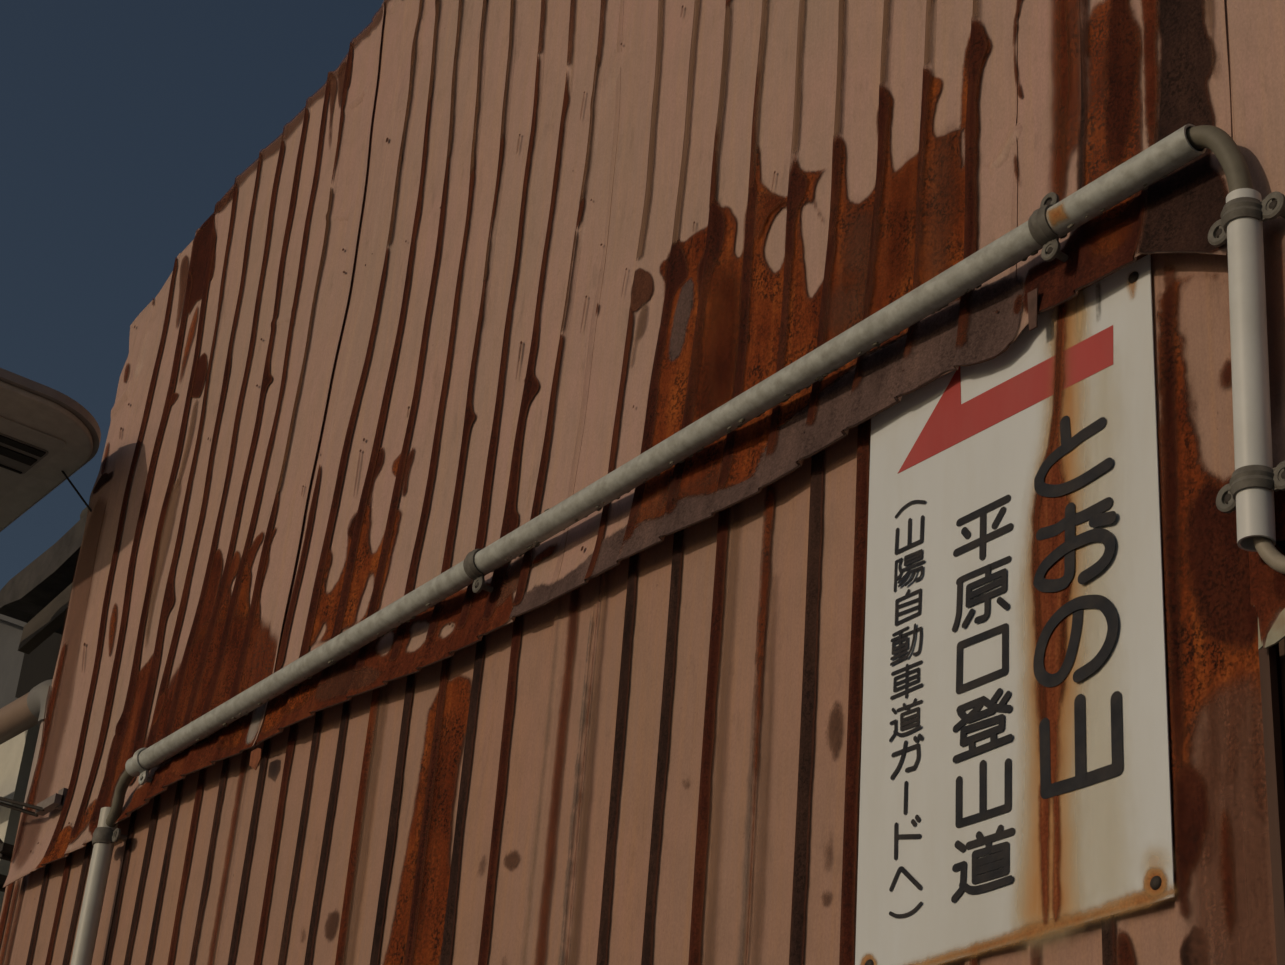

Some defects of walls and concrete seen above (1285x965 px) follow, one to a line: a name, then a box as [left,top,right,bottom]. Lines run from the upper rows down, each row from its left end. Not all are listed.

rust [10,0,389,965]
rust [299,0,462,658]
rust [404,0,487,596]
rust [441,0,606,574]
rust [104,148,1285,965]
rust [608,0,991,474]
rust [1013,0,1022,98]
rust [1048,0,1215,226]